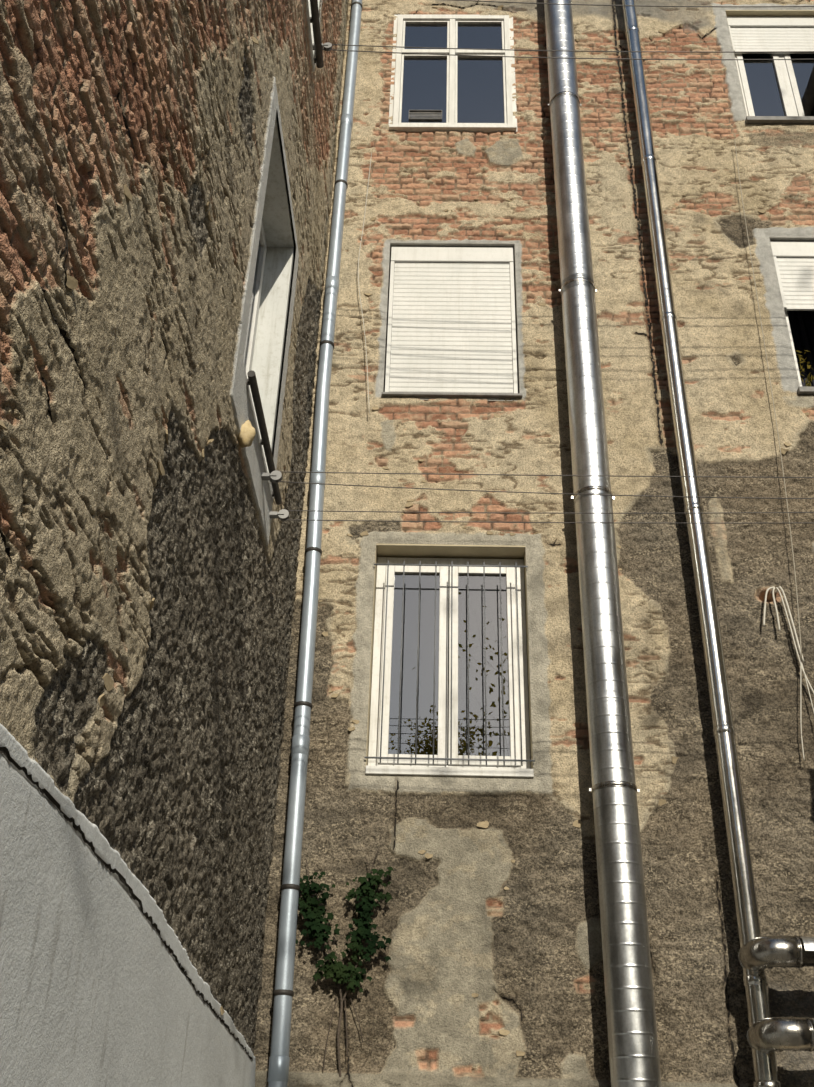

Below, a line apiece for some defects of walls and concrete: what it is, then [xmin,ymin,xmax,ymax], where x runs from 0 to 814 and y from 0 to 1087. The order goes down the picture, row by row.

flaking render [0,0,343,435]
crack [395,0,516,15]
flaking render [357,5,562,313]
crack [611,0,663,445]
flaking render [640,21,814,148]
spalling [33,274,324,1084]
crack [340,1008,353,1087]
crack [393,777,401,850]
flaking render [347,399,528,540]
spalling [288,600,611,1087]
spalling [575,28,755,1087]
spalling [696,406,814,937]